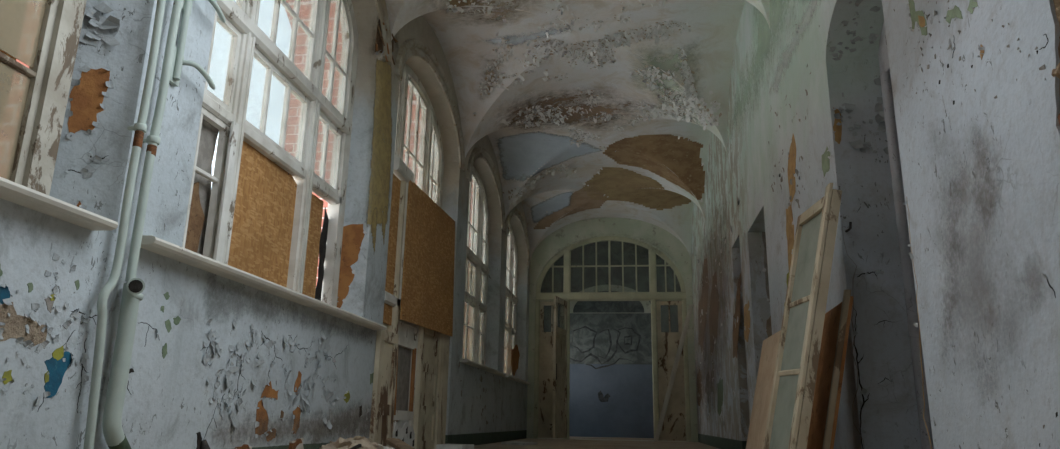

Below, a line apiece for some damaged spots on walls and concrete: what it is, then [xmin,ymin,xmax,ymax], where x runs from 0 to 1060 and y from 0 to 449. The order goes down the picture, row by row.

spalling [375,19,398,65]
peeling [894,0,984,94]
spalling [1007,0,1060,93]
peeling [65,65,114,142]
flaking render [446,0,722,229]
peeling [337,223,367,309]
peeling [0,253,88,411]
crack [842,200,932,449]
peeling [203,319,370,444]